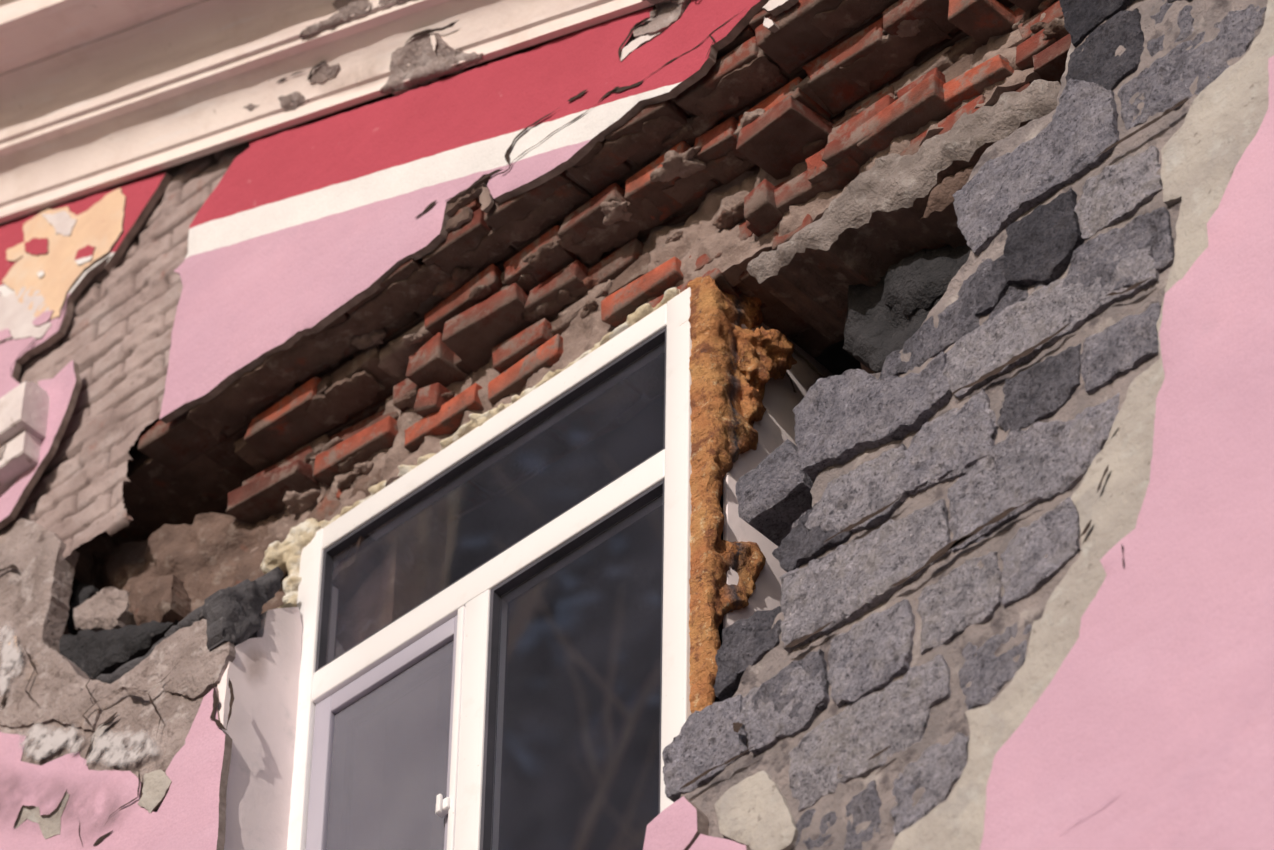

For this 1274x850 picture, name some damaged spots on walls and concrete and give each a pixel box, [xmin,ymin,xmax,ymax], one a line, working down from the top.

flaking render [276,60,341,110]
flaking render [299,0,404,38]
flaking render [380,19,484,96]
crack [500,0,799,174]
flaking render [620,0,691,62]
flaking render [444,169,501,232]
flaking render [891,0,1274,850]
spalling [0,136,288,813]
spalling [307,462,382,522]
flaking render [13,790,70,839]